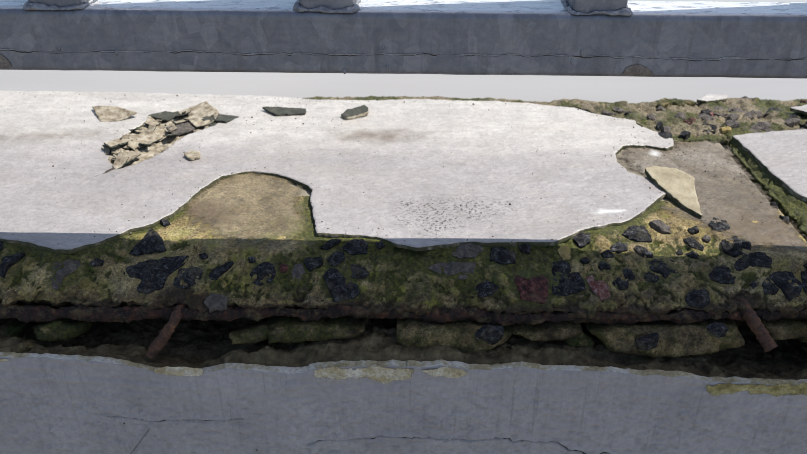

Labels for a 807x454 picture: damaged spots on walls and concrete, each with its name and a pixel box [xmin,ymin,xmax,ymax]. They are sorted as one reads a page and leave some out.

corrosion [0,55,12,69]
corrosion [622,65,654,76]
spalling [0,94,807,358]
spalling [154,366,203,377]
spalling [314,366,467,384]
spalling [706,383,807,397]